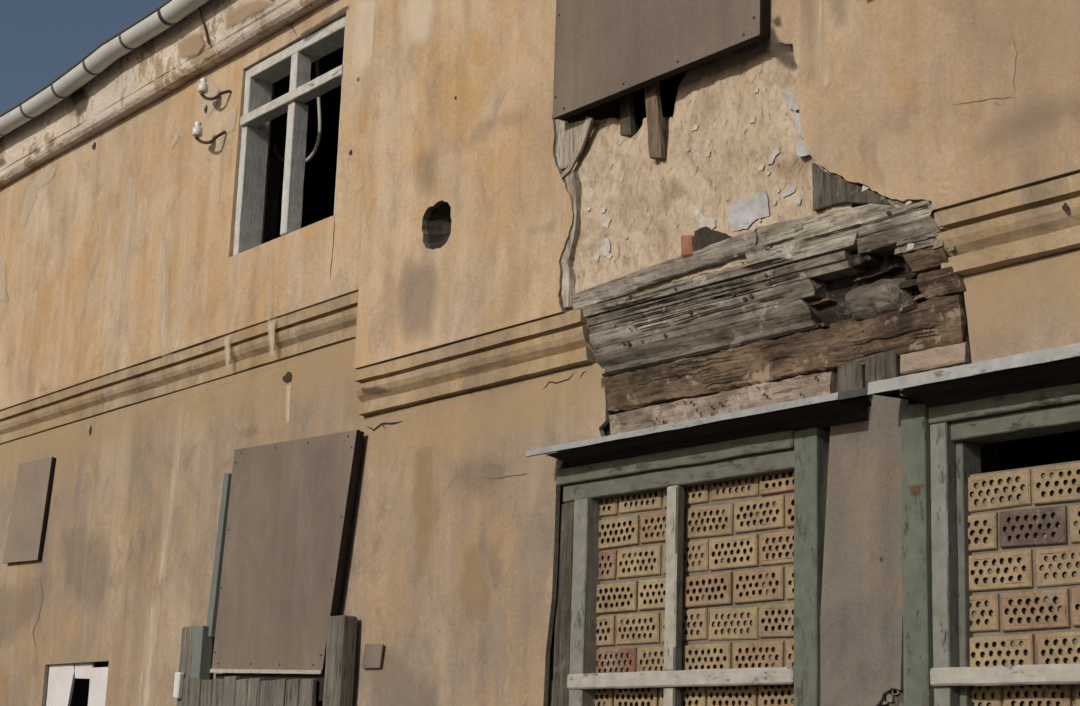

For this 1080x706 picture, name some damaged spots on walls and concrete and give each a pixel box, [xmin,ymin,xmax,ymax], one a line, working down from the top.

crack [954,37,1017,105]
spalling [555,38,852,311]
spalling [881,689,904,706]